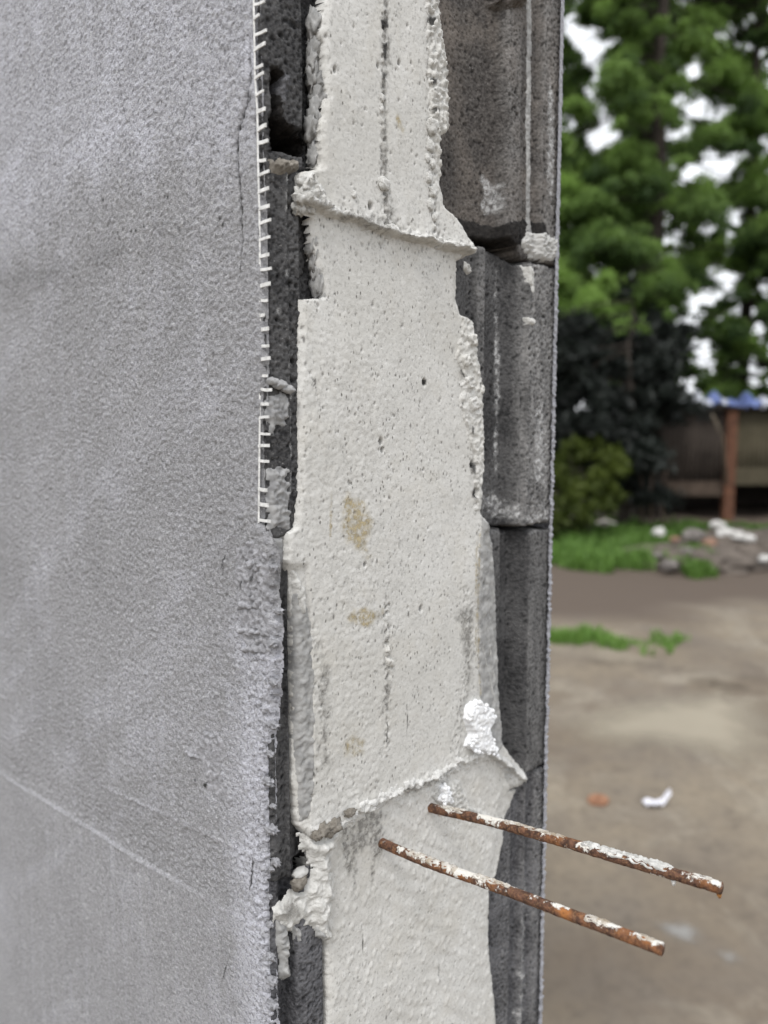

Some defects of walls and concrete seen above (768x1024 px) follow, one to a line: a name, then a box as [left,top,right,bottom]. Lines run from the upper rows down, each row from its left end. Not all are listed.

spalling [381,0,390,60]
spalling [484,0,527,13]
spalling [267,65,305,162]
spalling [425,0,450,177]
spalling [456,216,548,251]
spalling [454,316,485,511]
spalling [234,541,306,655]
flaking render [262,776,276,787]
flaking render [263,823,280,836]
flaking render [268,851,305,872]
flaking render [265,951,280,1011]